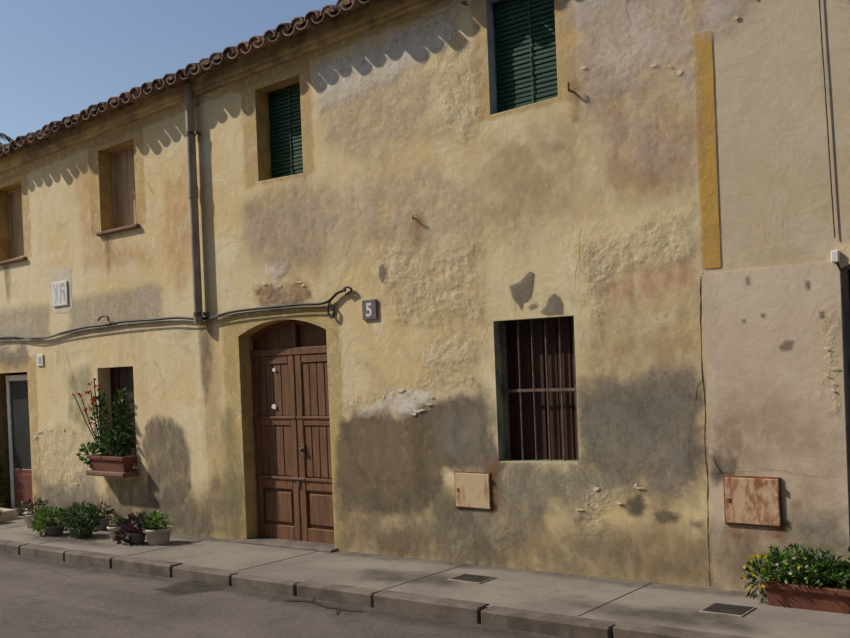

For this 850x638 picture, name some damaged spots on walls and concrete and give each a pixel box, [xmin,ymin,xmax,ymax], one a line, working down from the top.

peeling [314,18,454,111]
peeling [569,0,692,101]
spalling [254,262,309,305]
spalling [509,271,562,315]
damp [35,418,239,538]
peeling [360,388,432,417]
damp [337,370,736,579]
crack [695,276,808,586]